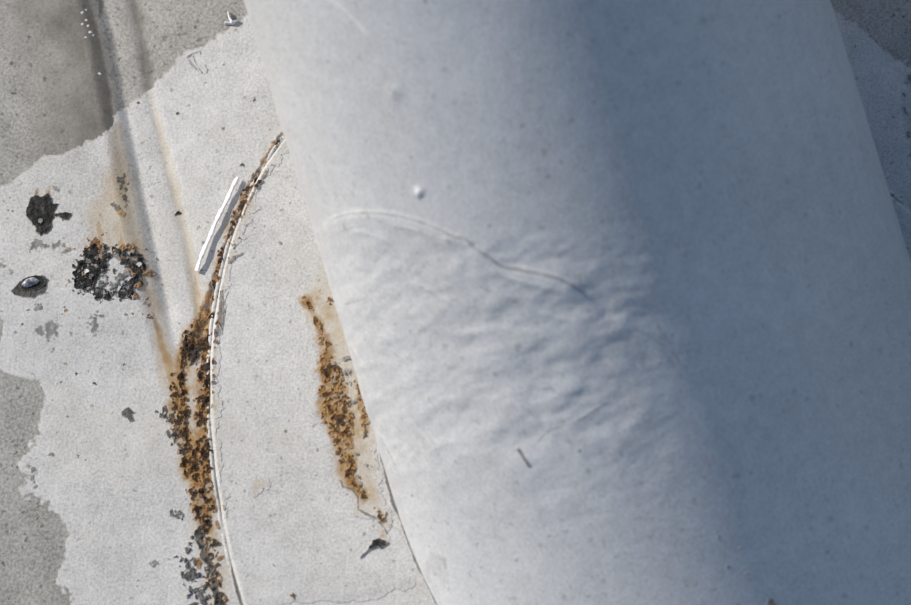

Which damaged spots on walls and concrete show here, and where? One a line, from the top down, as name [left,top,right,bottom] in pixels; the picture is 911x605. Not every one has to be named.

peeling [186,50,208,75]
peeling [110,173,131,217]
spalling [25,185,158,334]
peeling [35,305,65,343]
corrosion [67,88,289,605]
spalling [121,407,136,423]
corrosion [296,260,392,534]